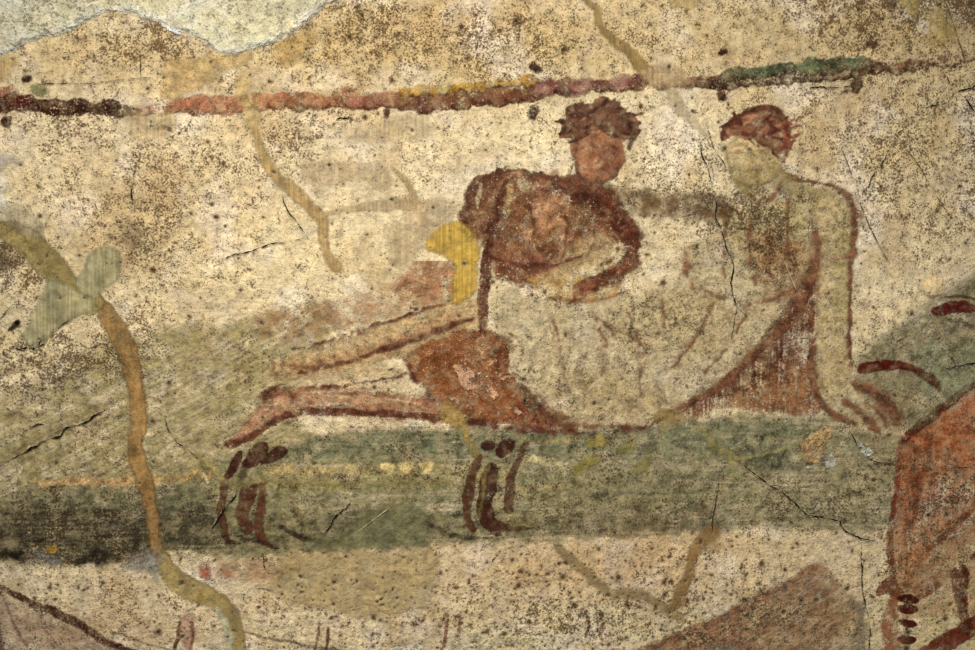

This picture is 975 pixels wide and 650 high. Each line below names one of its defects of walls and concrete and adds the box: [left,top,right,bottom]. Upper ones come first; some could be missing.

crack [213,127,422,272]
crack [584,0,748,338]
crack [857,70,975,192]
crack [0,152,453,650]
crack [698,418,875,650]